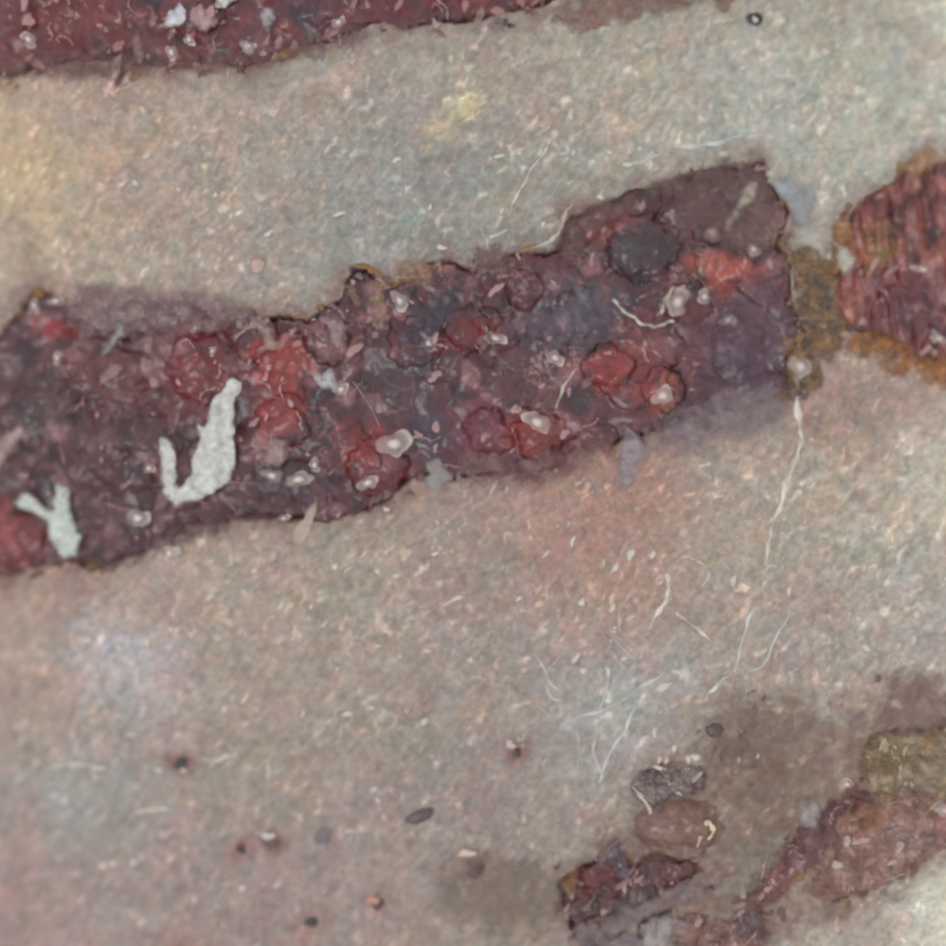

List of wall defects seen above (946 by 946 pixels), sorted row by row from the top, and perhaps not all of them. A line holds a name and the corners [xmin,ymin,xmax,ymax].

peeling [0,427,23,459]
peeling [159,379,241,504]
peeling [17,485,80,557]
peeling [602,541,635,573]
peeling [531,595,653,771]
peeling [652,724,701,765]